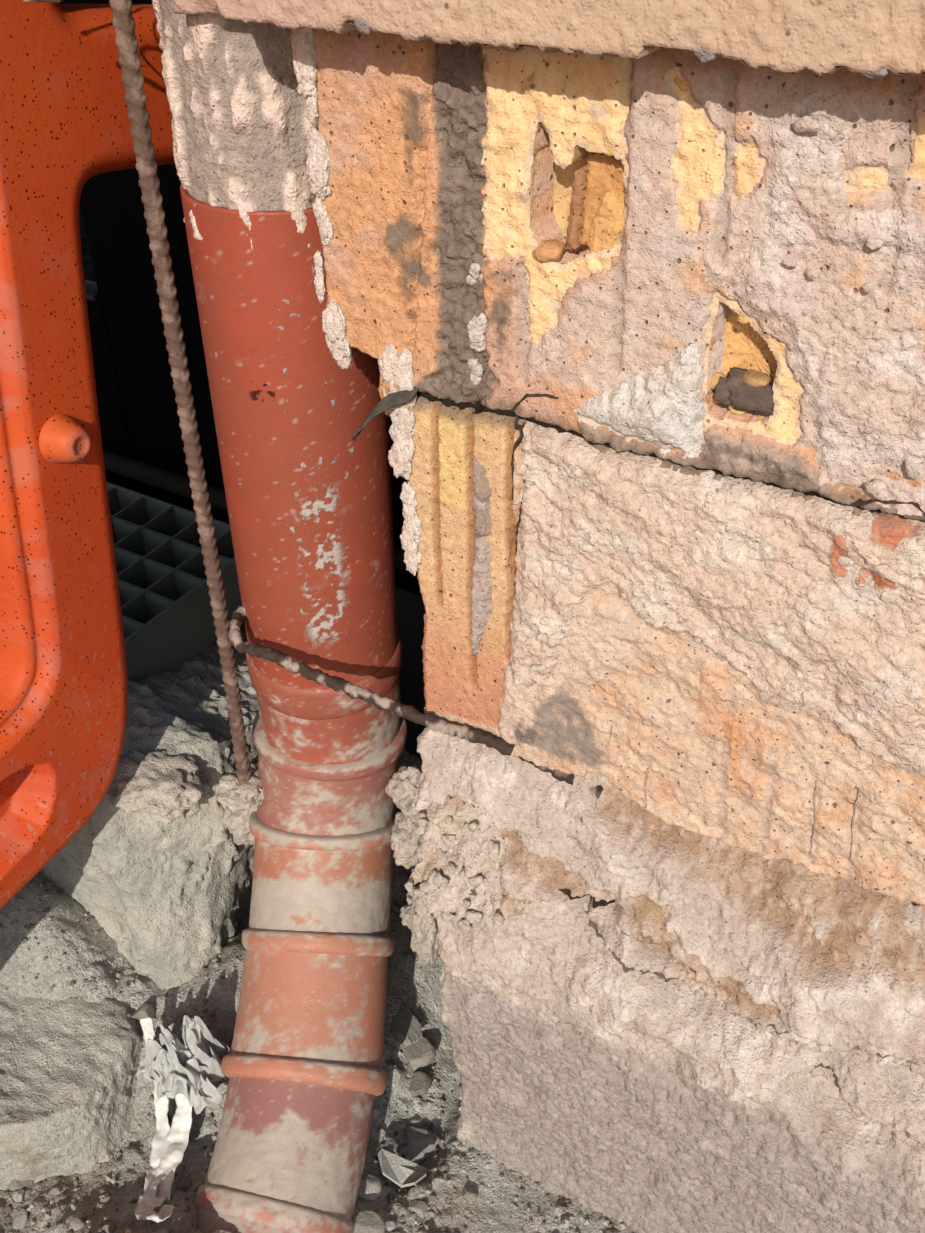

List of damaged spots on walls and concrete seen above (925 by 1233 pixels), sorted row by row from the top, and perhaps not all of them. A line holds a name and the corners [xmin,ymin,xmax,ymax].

peeling [291,28,346,354]
spalling [469,45,746,346]
spalling [664,67,766,233]
peeling [377,344,417,461]
peeling [466,313,488,377]
spalling [702,289,804,446]
peeling [400,481,422,565]
crack [417,391,925,608]
spalling [404,795,531,933]
crack [559,888,696,982]
crack [735,1013,788,1035]
crack [854,1045,919,1065]